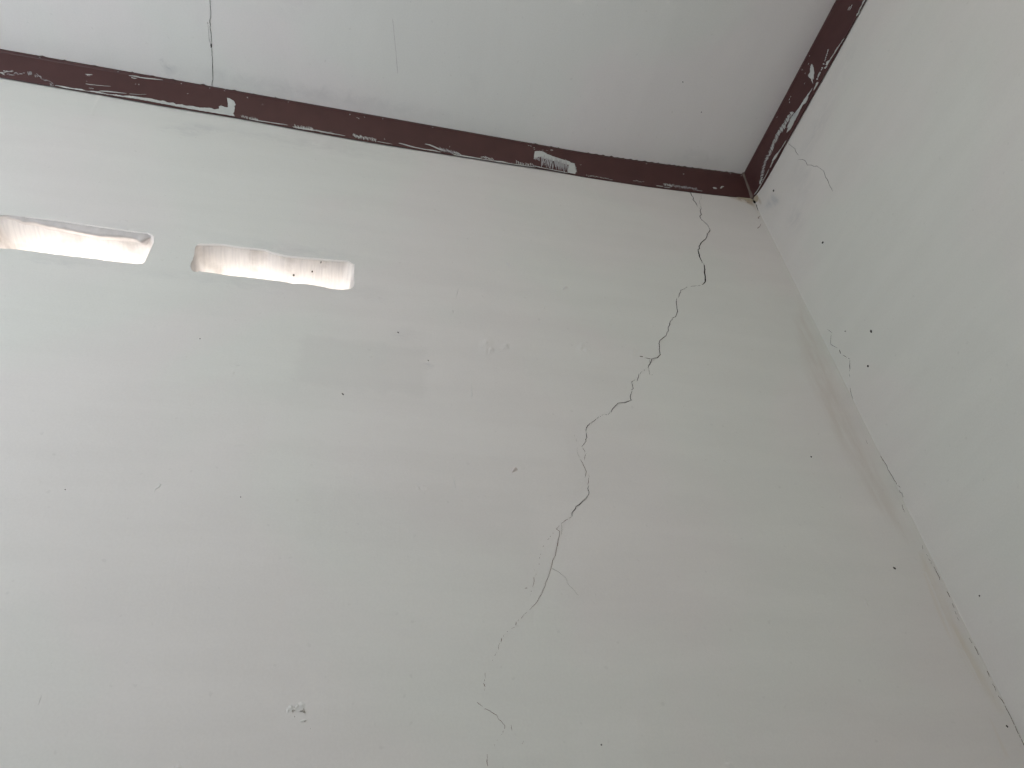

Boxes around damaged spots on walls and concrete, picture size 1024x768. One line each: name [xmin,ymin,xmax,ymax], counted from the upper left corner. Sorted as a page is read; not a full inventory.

crack [477,192,711,742]